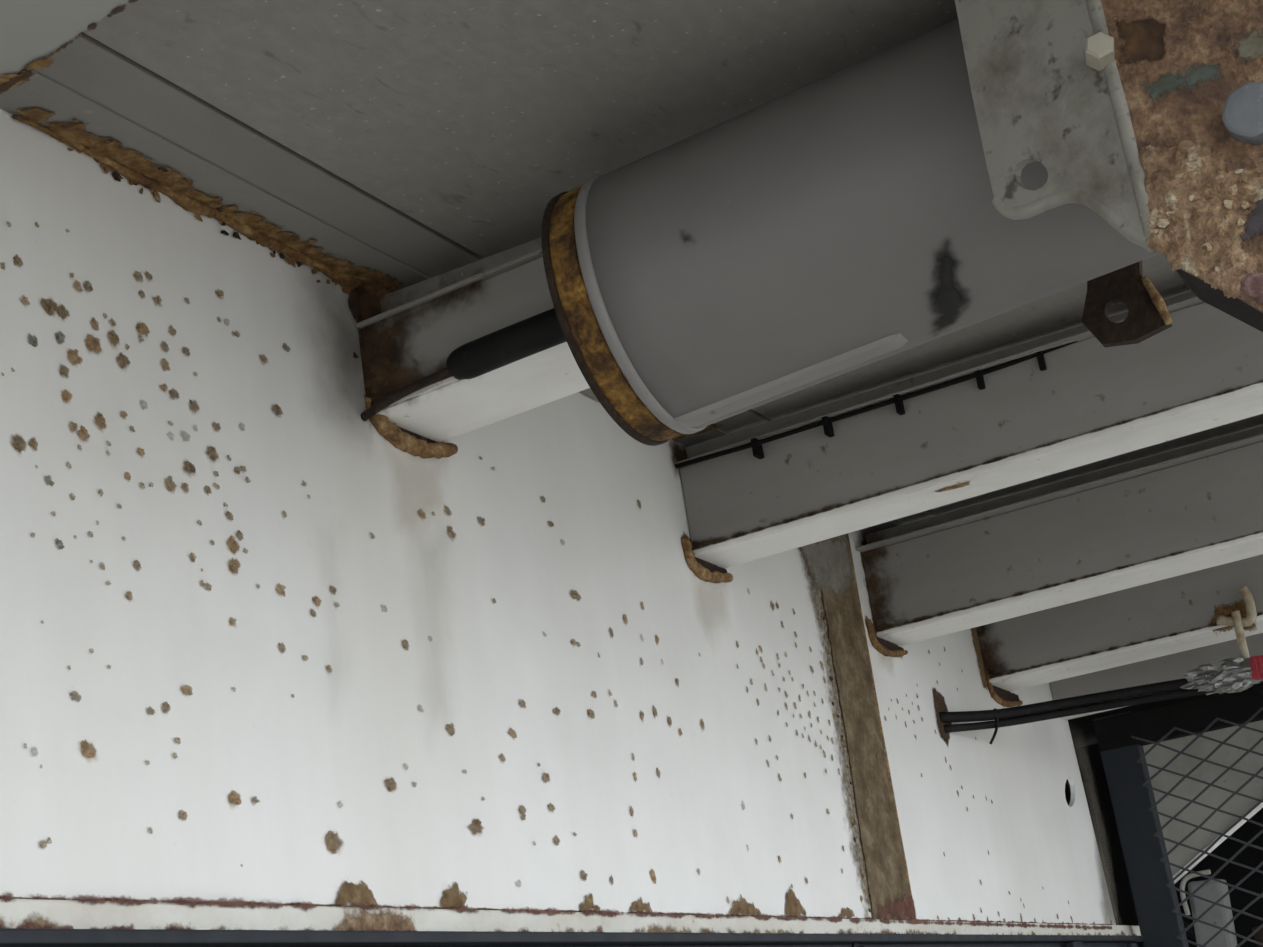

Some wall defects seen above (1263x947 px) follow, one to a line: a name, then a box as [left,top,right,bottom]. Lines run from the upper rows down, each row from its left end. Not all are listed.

peeling [1140,63,1220,100]
peeling [1238,29,1263,59]
corrosion [1101,0,1263,313]
corrosion [549,186,718,469]
damp [930,245,969,330]
corrosion [970,599,1263,697]
corrosion [0,521,1137,936]